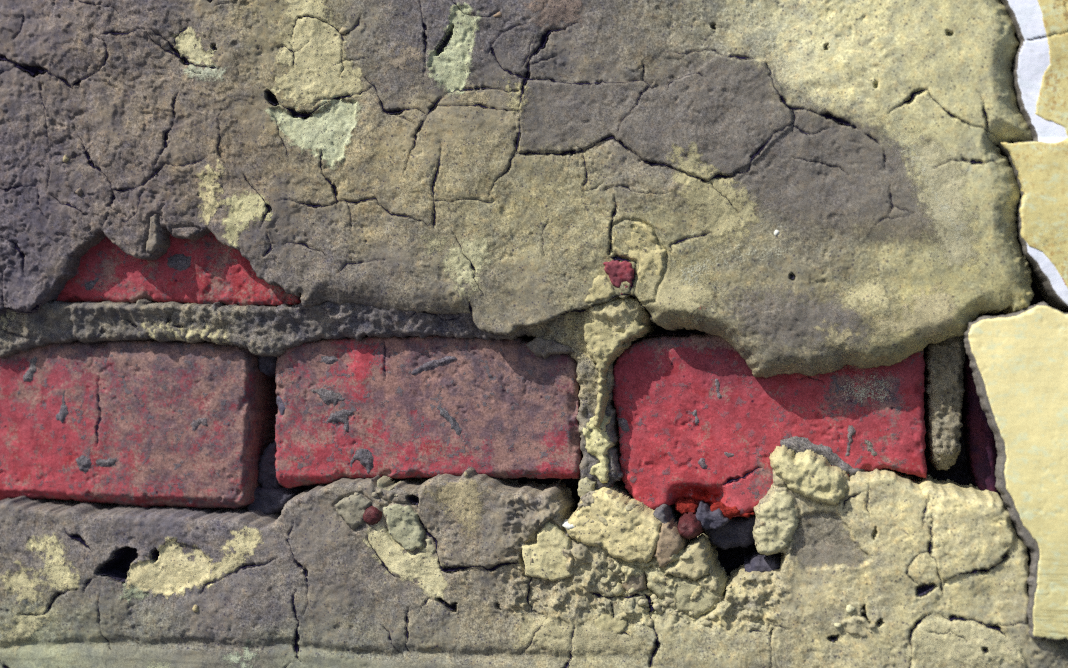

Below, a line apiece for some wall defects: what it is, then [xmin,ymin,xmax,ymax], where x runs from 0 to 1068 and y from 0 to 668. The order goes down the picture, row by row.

peeling [1007,0,1068,143]
crack [0,0,886,321]
crack [891,89,999,166]
peeling [1026,242,1068,305]
crack [64,529,90,549]
spalling [675,497,755,520]
crack [22,578,110,649]
crack [202,526,308,668]
crack [383,598,429,655]
crack [419,519,543,650]
crack [590,592,659,667]
crack [906,493,1026,668]